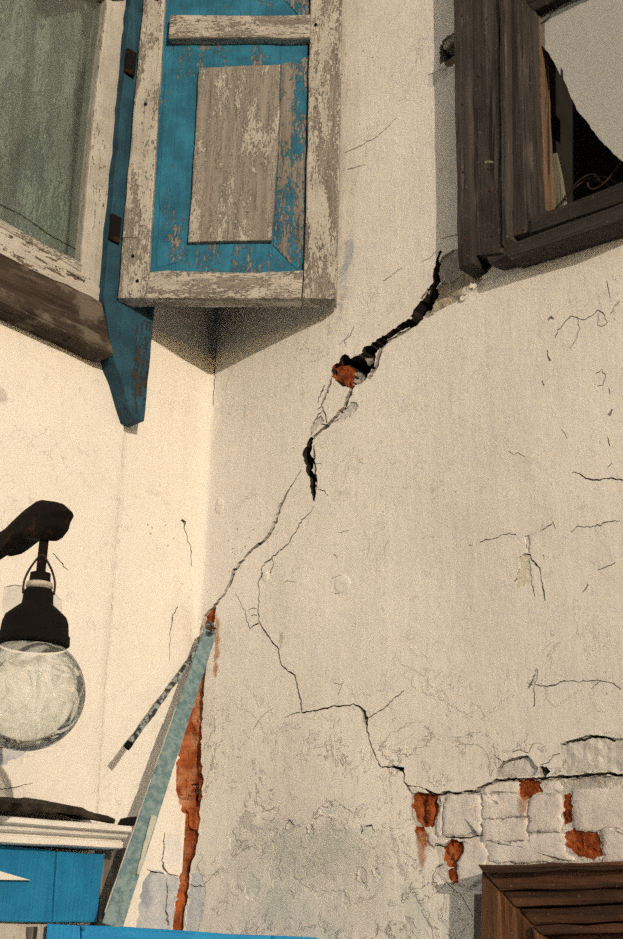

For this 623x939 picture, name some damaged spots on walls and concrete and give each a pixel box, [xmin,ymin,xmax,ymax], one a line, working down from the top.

spalling [424,249,492,318]
crack [541,281,620,386]
crack [572,369,623,481]
peeling [2,584,25,615]
peeling [53,594,62,613]
crack [196,234,457,794]
crack [469,520,620,601]
crack [527,668,620,706]
peeling [0,747,26,768]
peeling [136,815,206,931]
crack [147,668,220,930]
spalling [408,734,623,917]